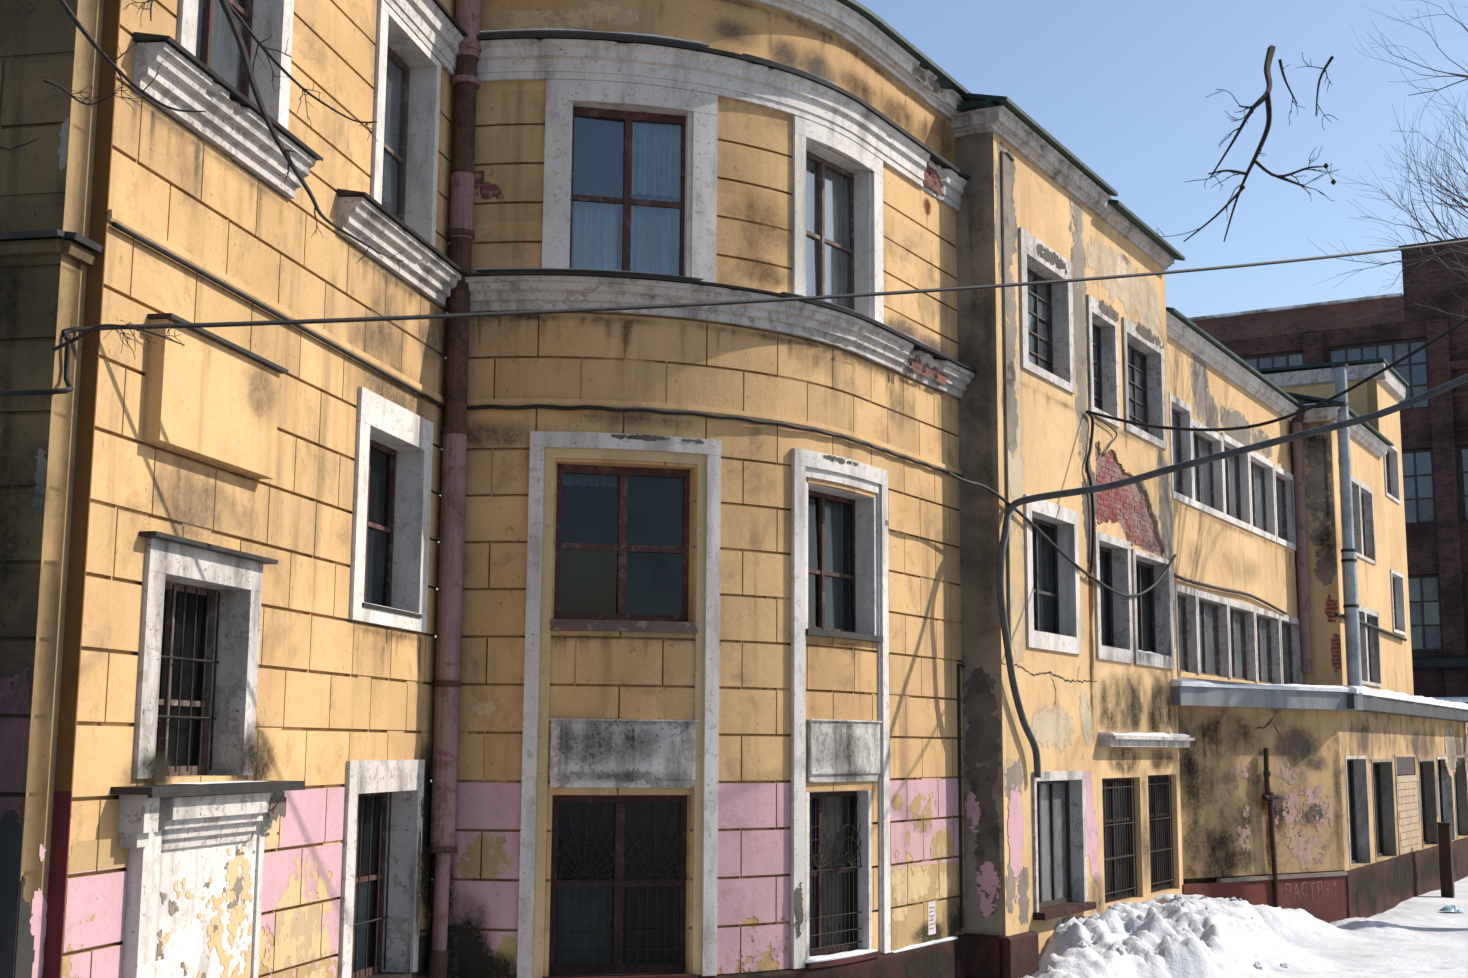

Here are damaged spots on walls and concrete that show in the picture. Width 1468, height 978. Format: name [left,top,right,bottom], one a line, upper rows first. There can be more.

spalling [994,140,1026,668]
flaking render [1037,196,1176,649]
leakage [1288,421,1326,463]
spalling [0,667,46,978]
peeling [154,787,345,978]
spalling [890,666,1030,950]
leakage [1117,719,1249,878]
leakage [1278,730,1323,769]